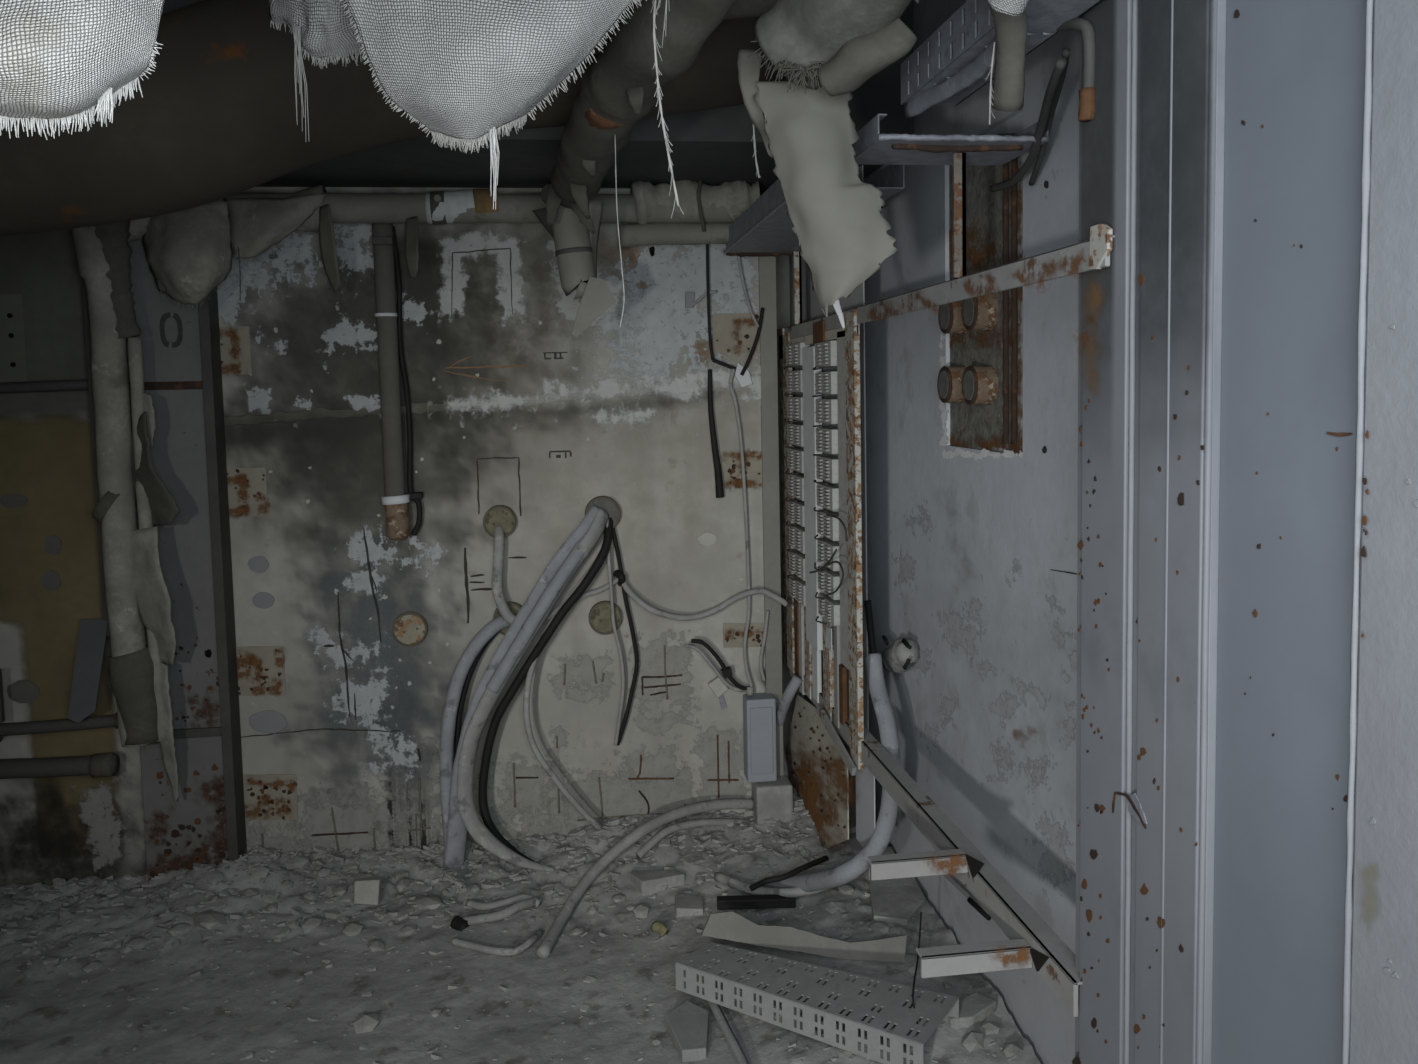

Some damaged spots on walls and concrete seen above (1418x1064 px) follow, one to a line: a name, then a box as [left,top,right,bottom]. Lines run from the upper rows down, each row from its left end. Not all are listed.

peeling [217,223,378,374]
peeling [396,291,435,326]
leakage [395,230,761,509]
rust [892,144,1083,454]
rust [227,474,269,517]
leakage [224,268,449,748]
peeling [334,514,452,600]
rust [146,763,228,881]
spalling [245,620,442,854]
rust [787,694,852,848]
rust [1087,792,1147,829]
rust [1080,879,1110,943]